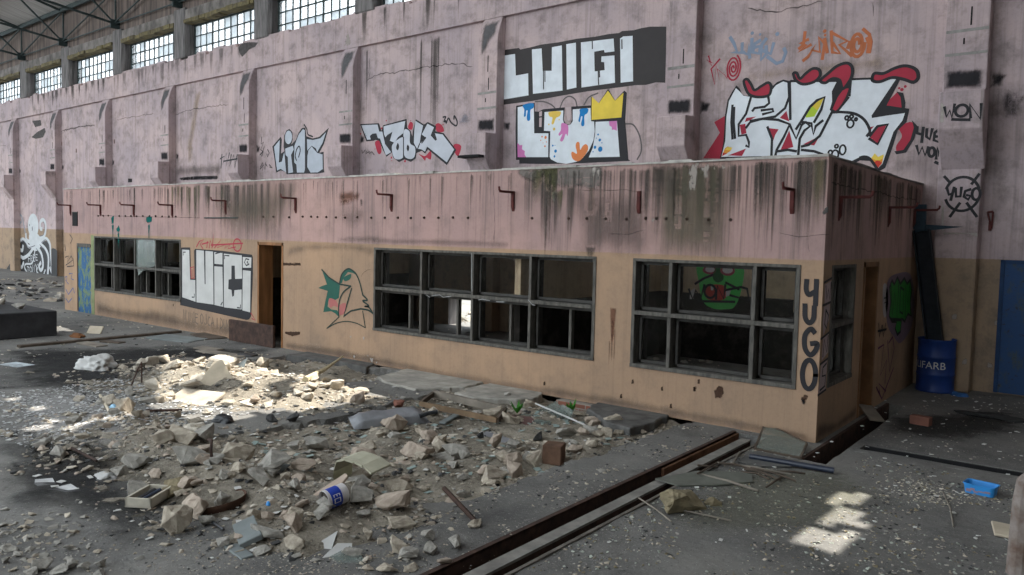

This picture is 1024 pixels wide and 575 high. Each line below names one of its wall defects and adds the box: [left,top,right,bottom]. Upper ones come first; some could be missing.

crack [749,1,821,13]
crack [369,58,472,79]
water stain [534,168,579,227]
water stain [619,160,918,214]